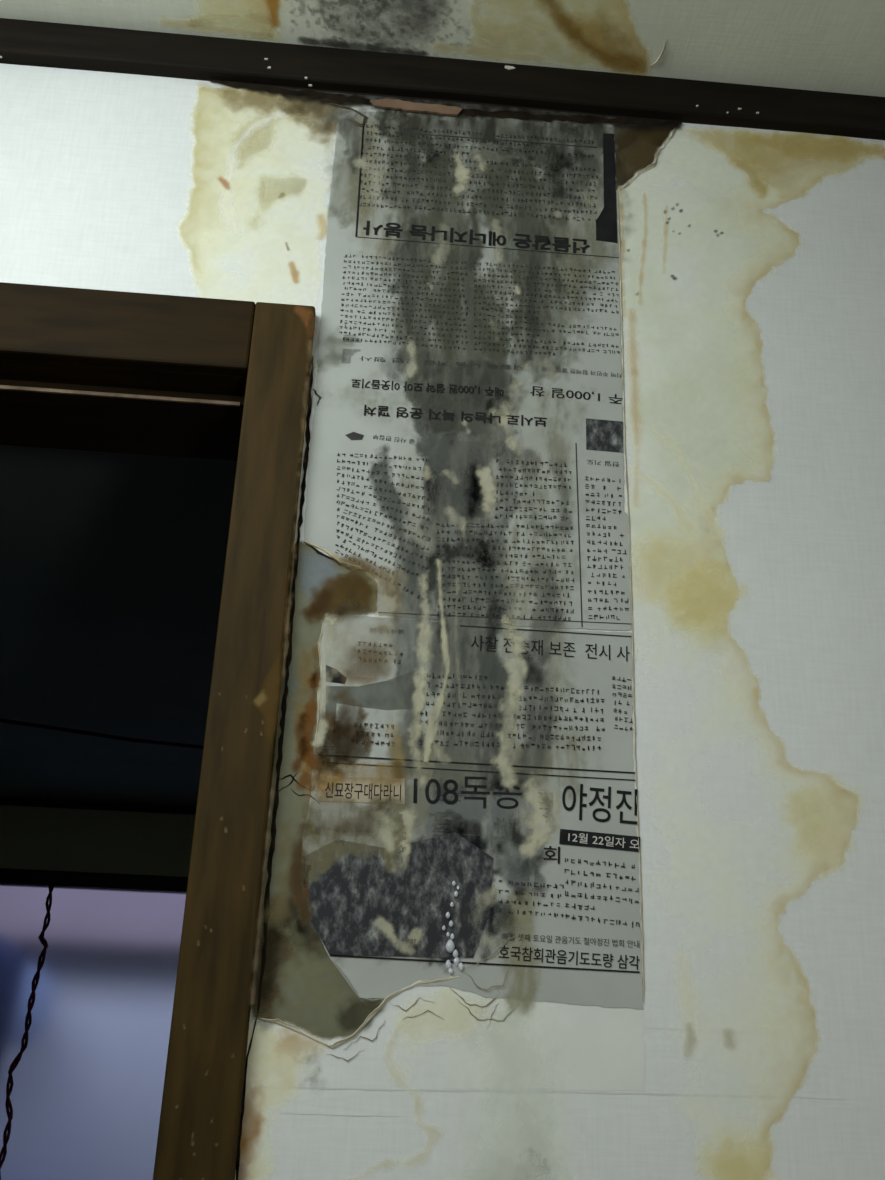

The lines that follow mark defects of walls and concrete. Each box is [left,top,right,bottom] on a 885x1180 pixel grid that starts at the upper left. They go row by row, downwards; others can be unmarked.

leakage [165,0,278,36]
leakage [299,0,459,56]
leakage [468,0,645,72]
rust [273,647,407,921]
rust [307,557,397,620]
peeling [251,541,461,1049]
leakage [180,87,617,1008]
leakage [619,129,885,1180]